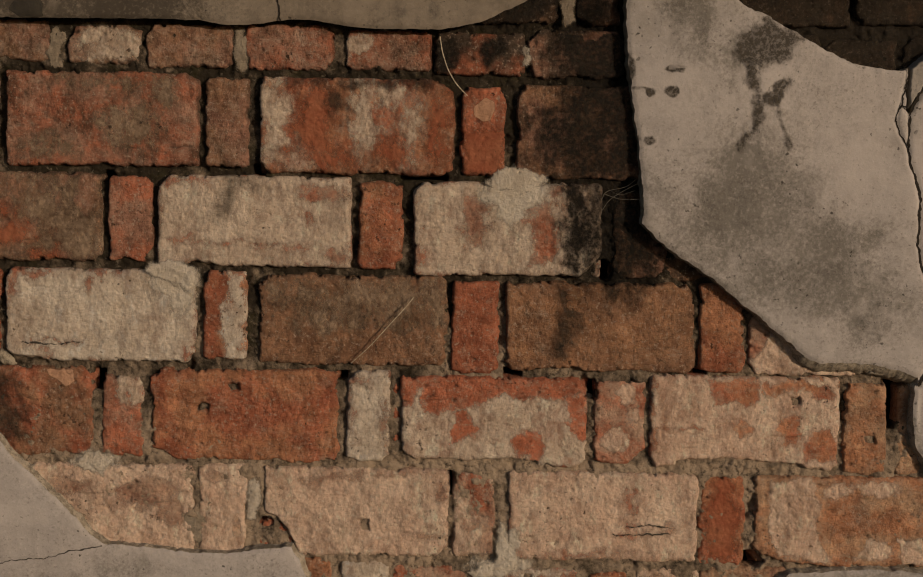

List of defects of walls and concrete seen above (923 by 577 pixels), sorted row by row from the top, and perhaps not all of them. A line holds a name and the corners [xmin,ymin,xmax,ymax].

peeling [5,244,198,387]
peeling [80,26,142,63]
peeling [157,77,352,360]
peeling [346,33,374,65]
peeling [348,78,428,163]
peeling [401,0,923,577]
leakage [734,17,805,152]
crack [895,55,923,273]
peeling [0,369,495,577]
crack [0,545,102,564]